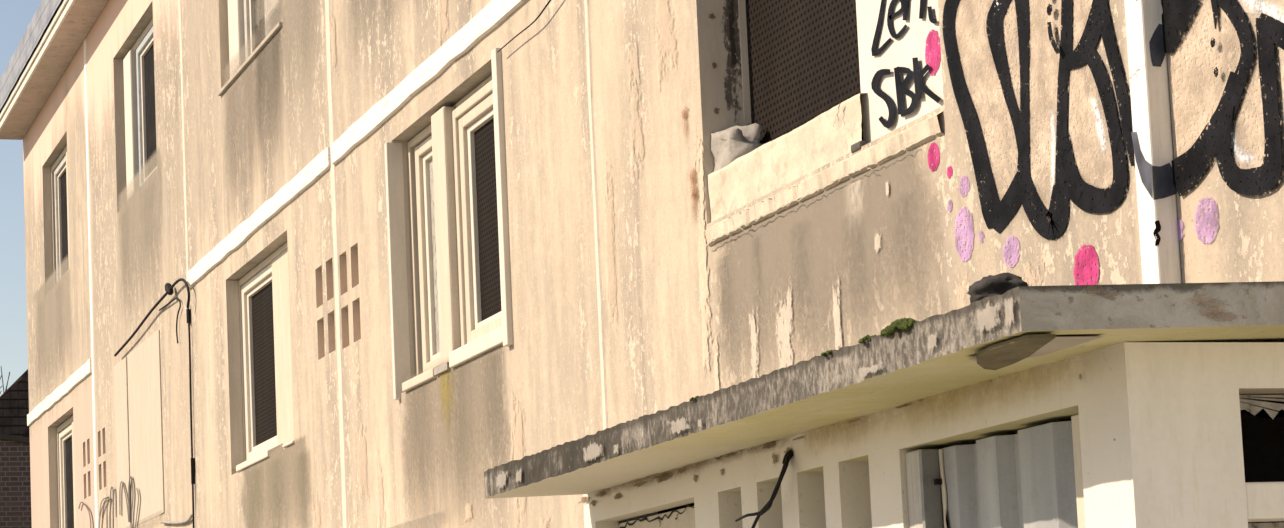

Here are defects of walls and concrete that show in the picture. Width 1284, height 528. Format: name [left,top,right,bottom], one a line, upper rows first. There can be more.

damp [226,0,314,146]
peeling [1020,257,1044,286]
peeling [748,310,760,378]
peeling [771,282,793,369]
peeling [832,279,842,350]
peeling [859,362,883,379]
peeling [928,334,936,349]
spalling [956,270,1105,370]
damp [405,347,505,488]
damp [243,439,307,528]
crack [618,505,694,528]